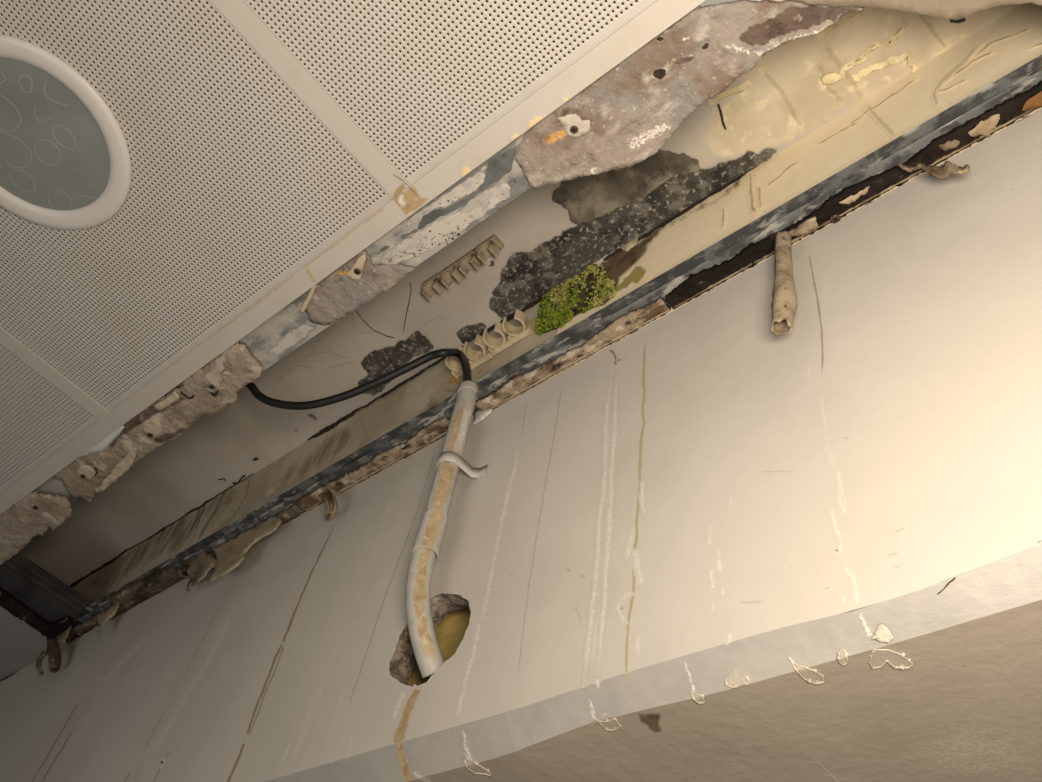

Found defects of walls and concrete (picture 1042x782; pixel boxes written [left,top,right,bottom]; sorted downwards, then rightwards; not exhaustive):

flaking render [694,0,1042,166]
damp [482,116,776,318]
flaking render [620,237,638,251]
peeling [473,408,492,425]
corrosion [410,357,470,673]
damp [582,334,648,722]
hole [390,624,432,687]
hole [431,593,471,661]
peeling [872,624,894,643]
corrosion [389,684,436,782]